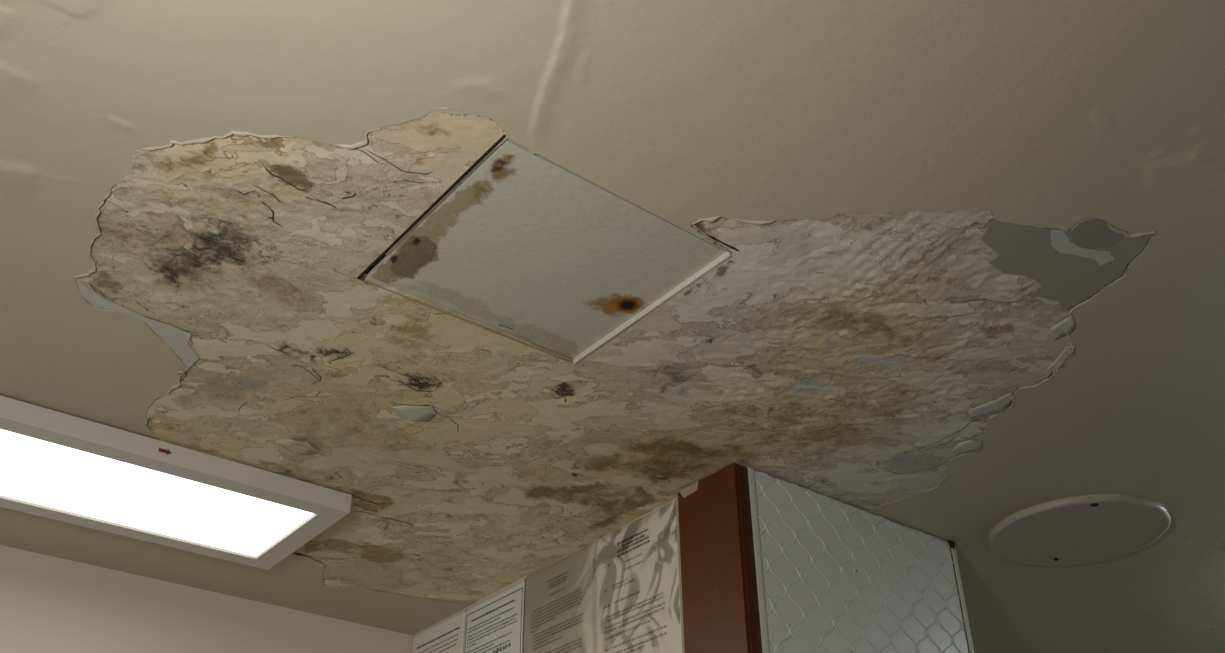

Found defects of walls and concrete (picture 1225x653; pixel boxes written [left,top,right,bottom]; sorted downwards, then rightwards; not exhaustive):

damp [161,223,249,283]
corrosion [586,297,643,315]
damp [399,373,442,389]
peeling [72,107,1157,601]
damp [527,440,715,527]